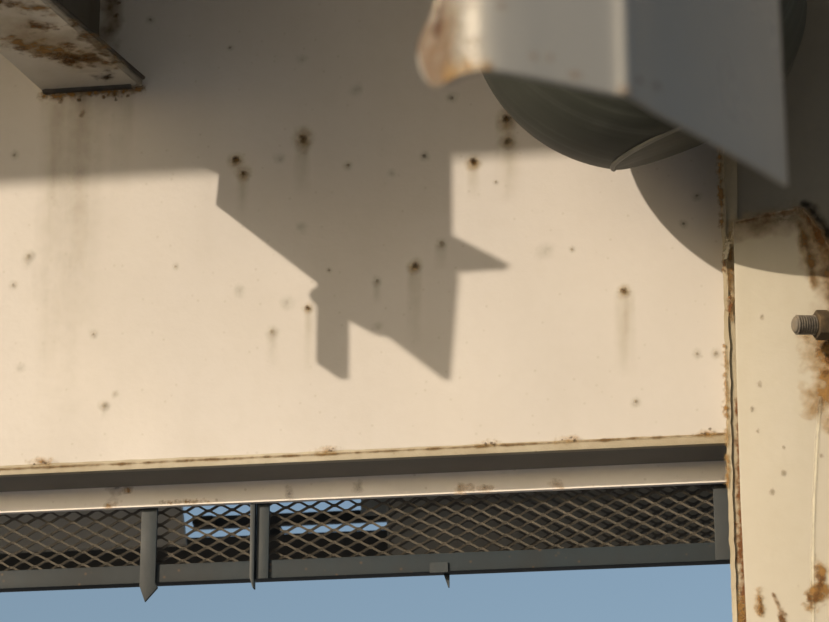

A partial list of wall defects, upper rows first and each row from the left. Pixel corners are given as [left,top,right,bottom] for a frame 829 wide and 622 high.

corrosion [0,0,120,80]
corrosion [418,2,493,86]
corrosion [42,86,145,101]
corrosion [804,336,829,414]
corrosion [0,459,86,470]
corrosion [425,442,538,450]
corrosion [691,344,763,622]
corrosion [807,564,829,610]